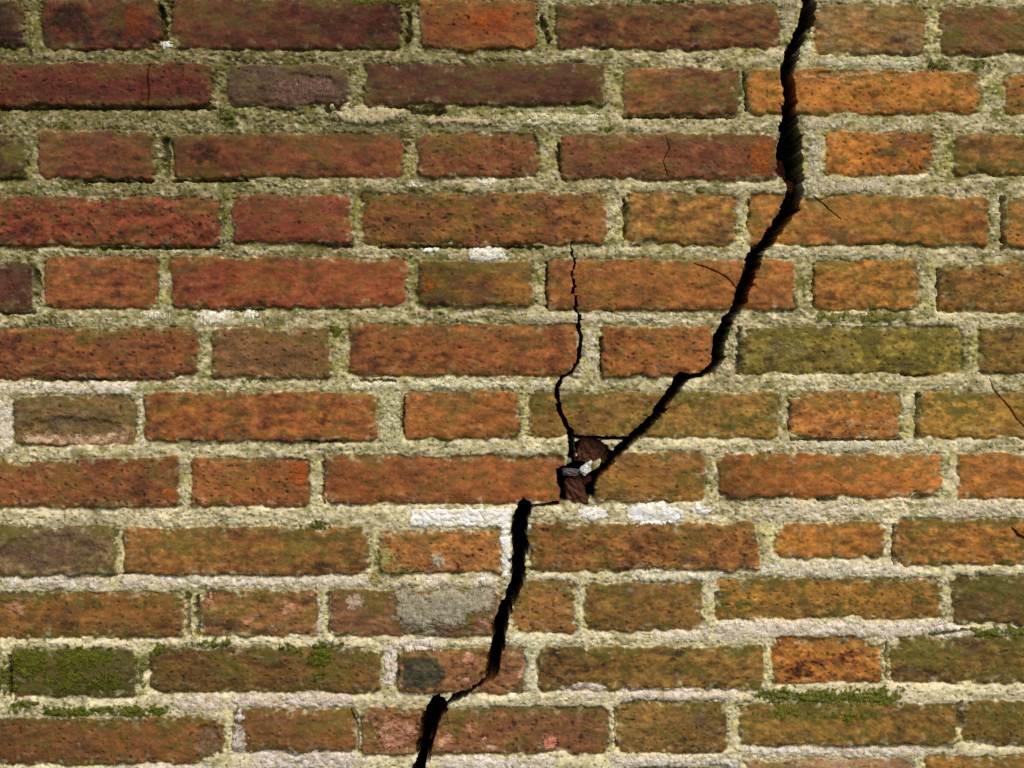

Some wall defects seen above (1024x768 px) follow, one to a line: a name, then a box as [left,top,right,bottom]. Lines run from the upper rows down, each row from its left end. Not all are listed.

crack [412,0,842,768]
damp [409,507,512,589]
damp [578,505,608,521]
damp [622,500,715,527]